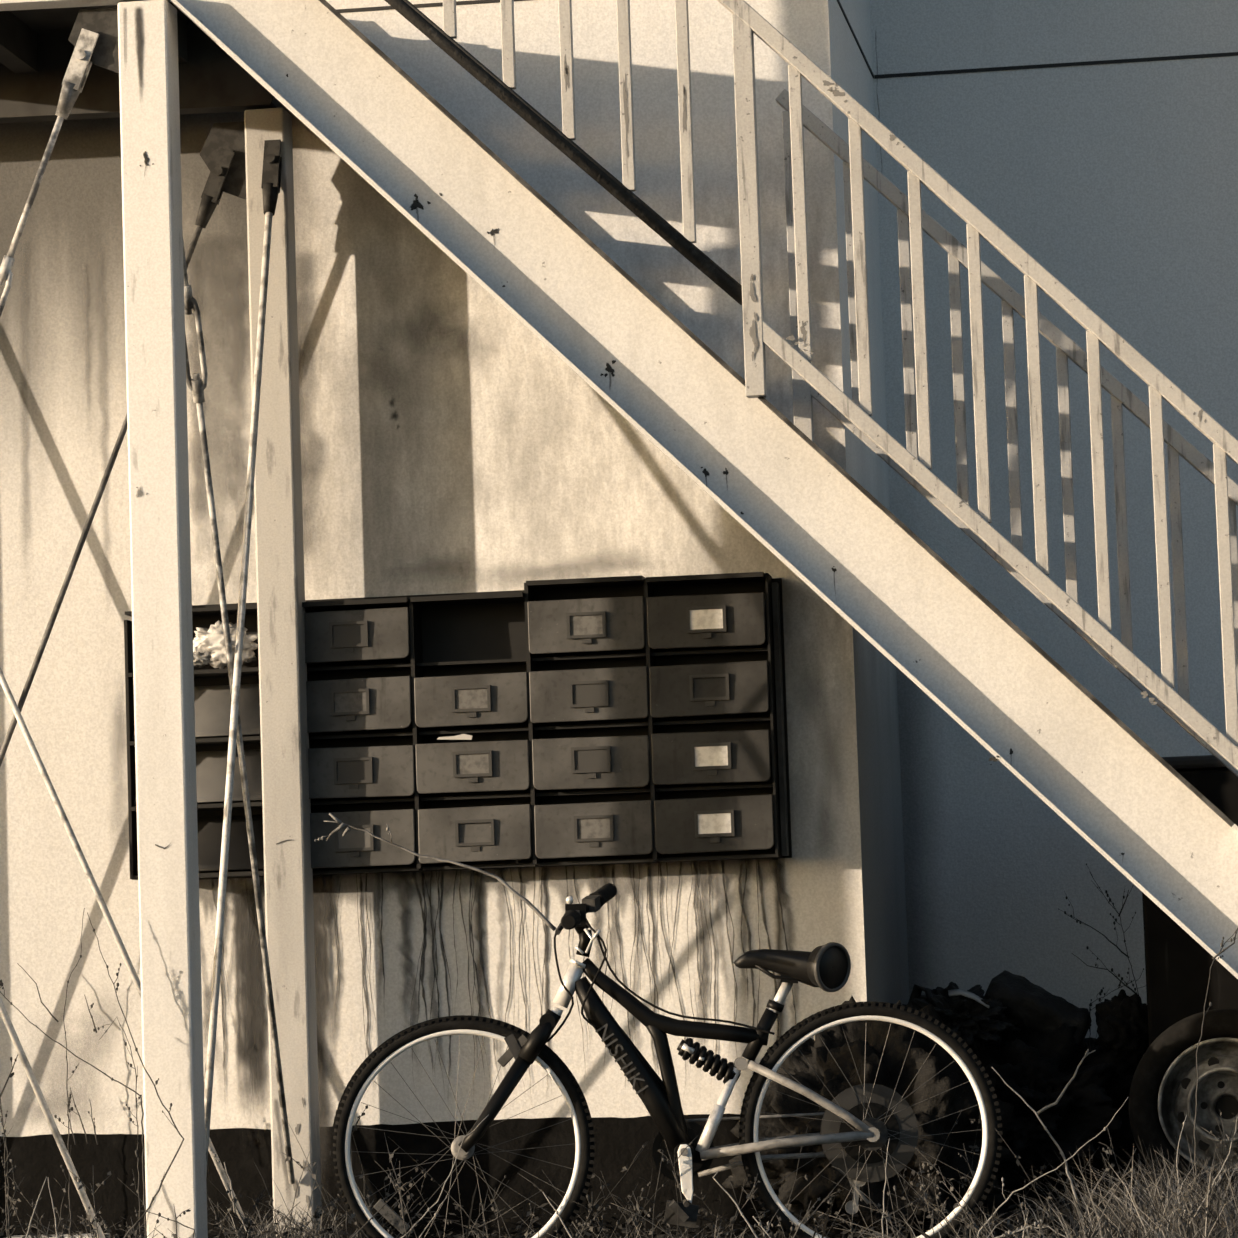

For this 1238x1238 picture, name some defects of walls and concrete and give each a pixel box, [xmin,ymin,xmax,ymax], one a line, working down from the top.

corrosion [410,193,442,220]
corrosion [600,360,616,387]
leakage [220,881,266,1091]
leakage [356,874,385,1056]
leakage [411,870,549,1031]
leakage [602,860,796,1040]